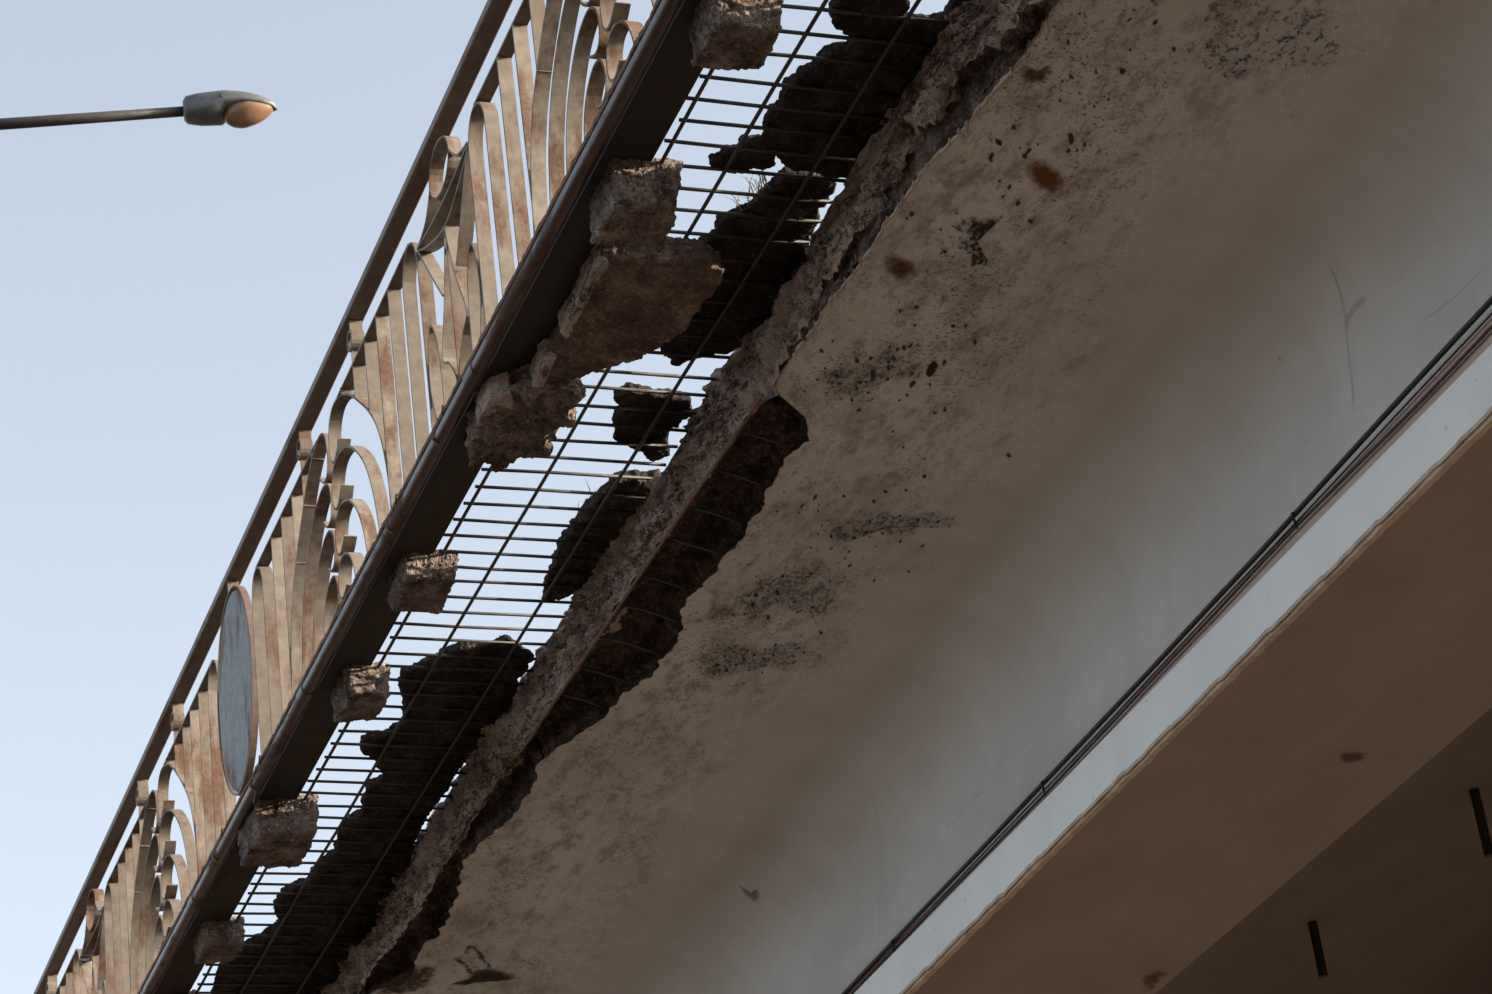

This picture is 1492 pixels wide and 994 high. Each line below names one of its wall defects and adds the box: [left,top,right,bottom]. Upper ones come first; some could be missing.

leakage [1059,74,1110,153]
rust [1027,161,1063,192]
leakage [803,306,931,412]
spalling [195,0,1058,994]
leakage [699,489,954,686]